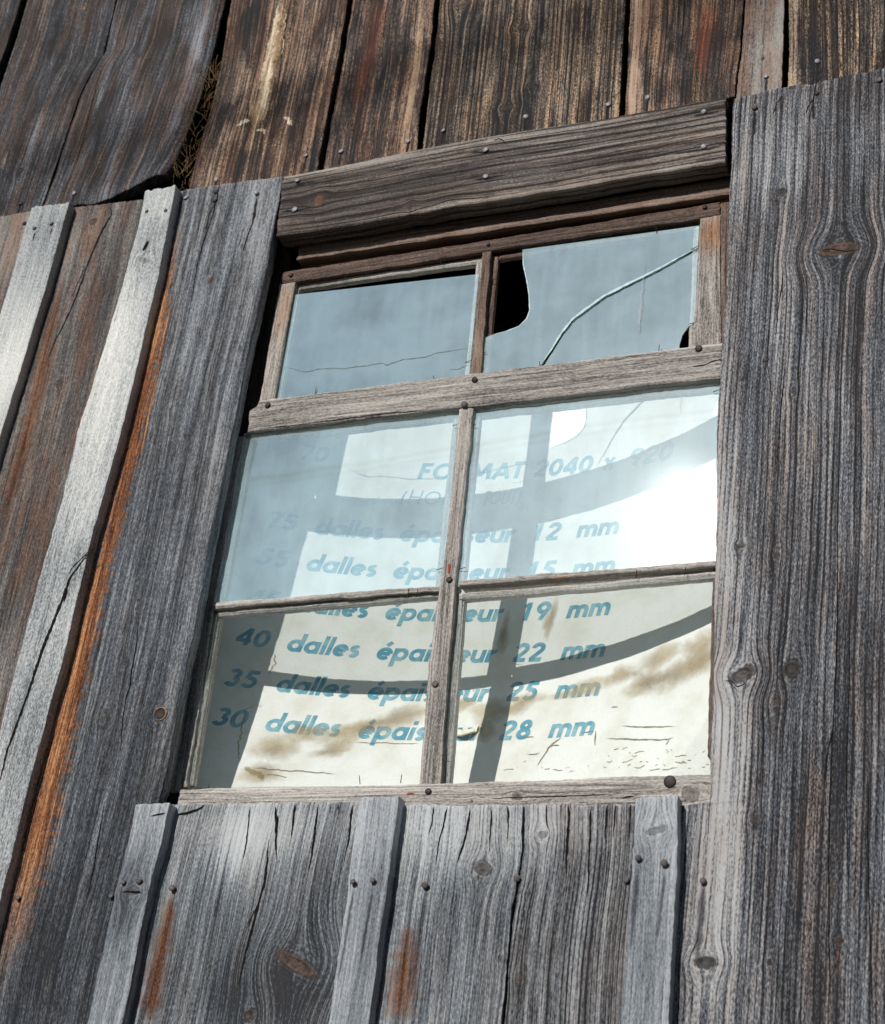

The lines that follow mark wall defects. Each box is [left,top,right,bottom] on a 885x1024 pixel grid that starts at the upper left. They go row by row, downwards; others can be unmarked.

crack [0,547,94,779]
crack [238,805,353,986]